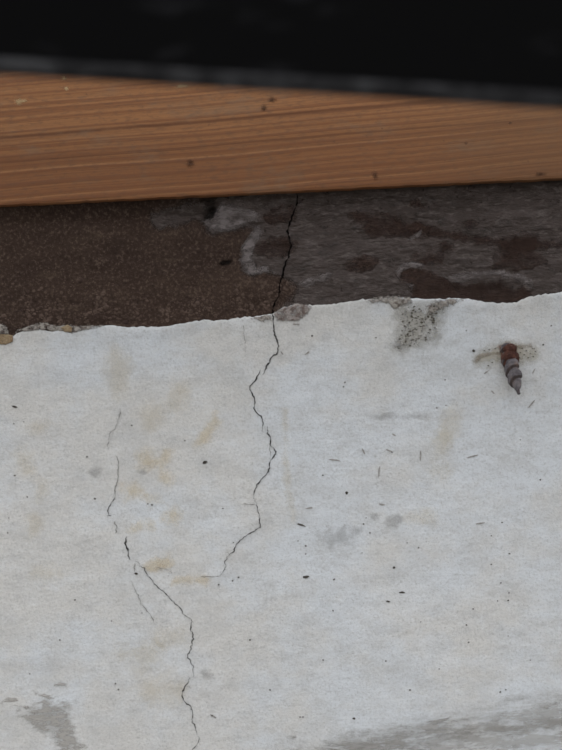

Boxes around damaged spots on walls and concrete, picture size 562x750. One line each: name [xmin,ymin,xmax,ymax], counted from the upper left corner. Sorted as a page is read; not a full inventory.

crack [201,193,298,577]
peeling [0,180,562,349]
crack [107,412,199,749]